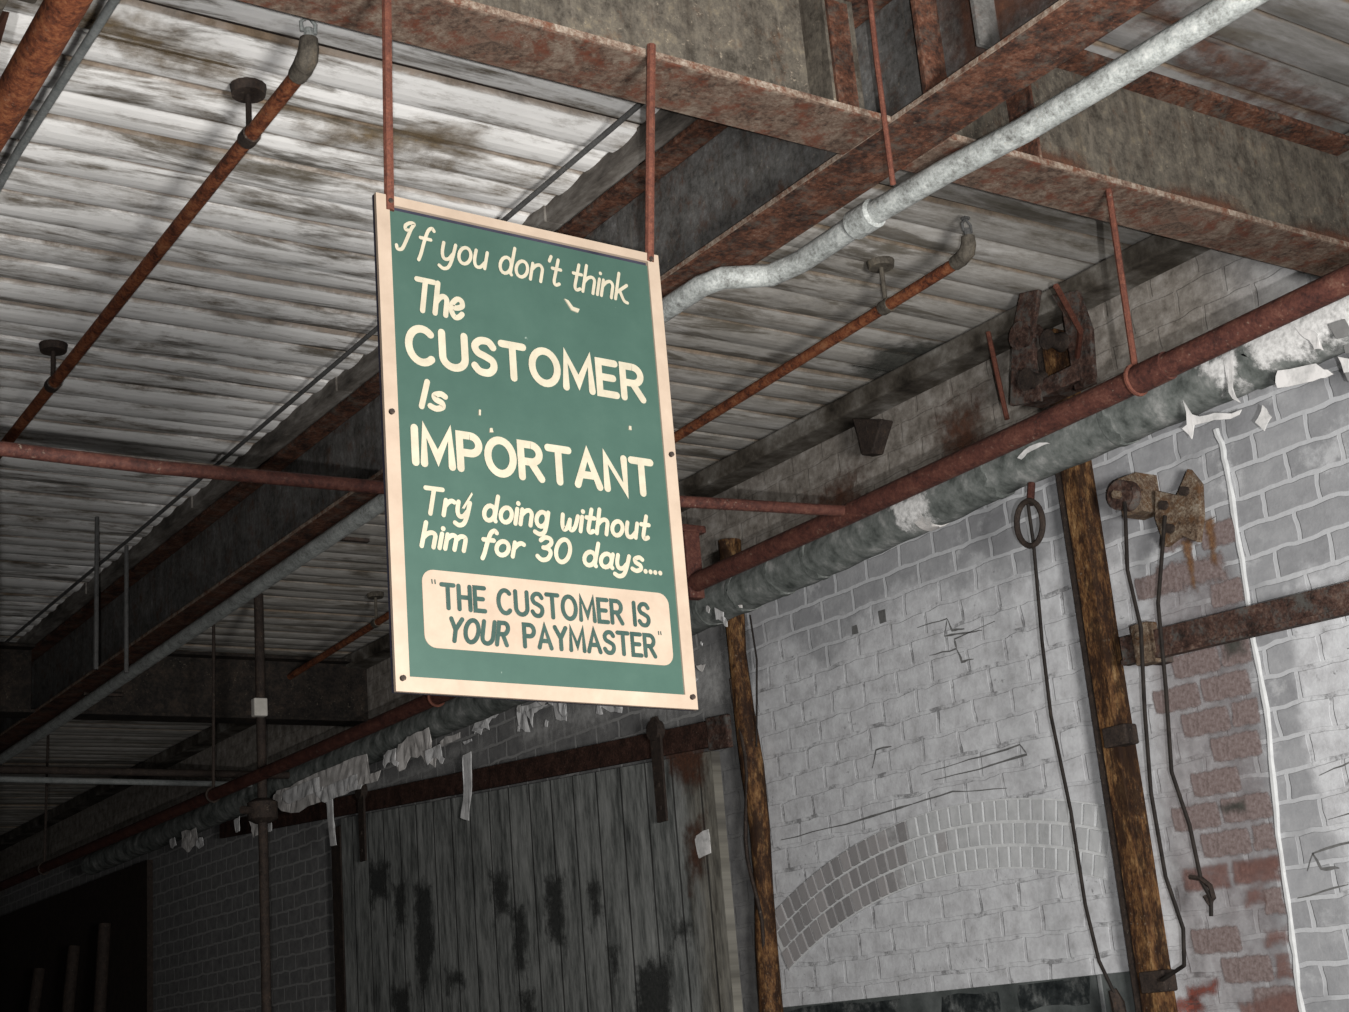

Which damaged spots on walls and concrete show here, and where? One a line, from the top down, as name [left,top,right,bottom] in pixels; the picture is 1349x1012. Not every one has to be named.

rust [959,0,984,63]
rust [994,0,1053,30]
rust [1182,540,1195,587]
peeling [1134,518,1245,613]
rust [1205,519,1216,562]
crack [917,618,995,663]
peeling [694,647,731,705]
peeling [513,702,623,747]
peeling [1153,639,1286,915]
peeling [695,829,711,858]
crack [1297,813,1349,898]
peeling [1176,926,1299,1012]